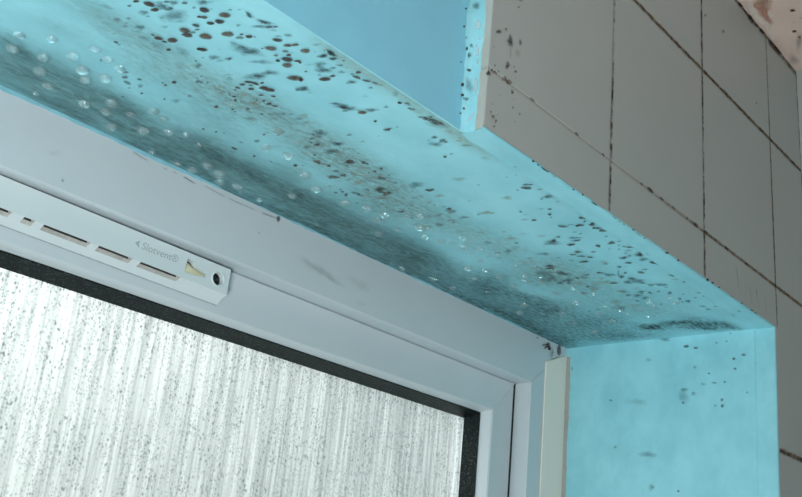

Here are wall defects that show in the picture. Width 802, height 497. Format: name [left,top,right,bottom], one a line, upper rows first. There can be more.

water stain [127,0,187,16]
water stain [151,1,425,219]
water stain [0,52,430,273]
water stain [634,0,802,307]
water stain [568,217,658,292]
water stain [496,310,572,354]
water stain [640,321,734,330]